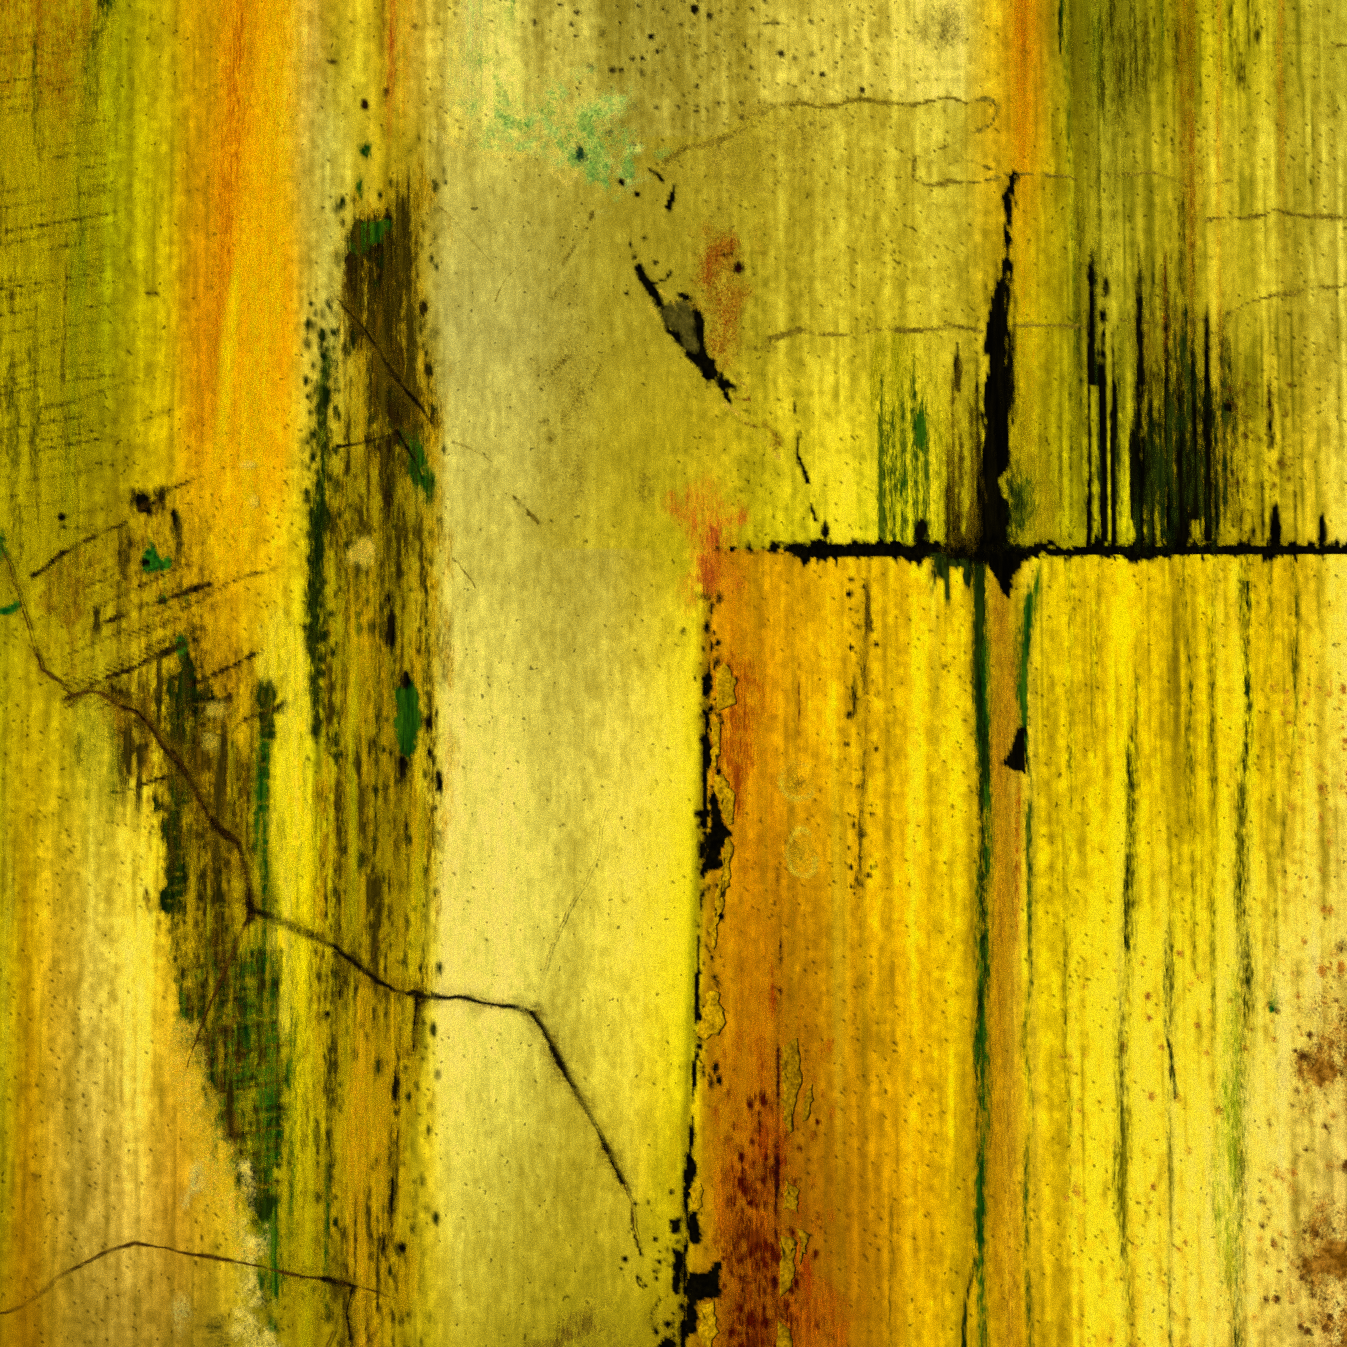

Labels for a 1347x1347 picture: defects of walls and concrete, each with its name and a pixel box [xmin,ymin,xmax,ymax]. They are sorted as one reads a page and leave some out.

leakage [661,96,997,183]
spalling [629,237,750,415]
leakage [737,326,848,355]
leakage [846,579,879,651]
crack [716,518,1347,603]
leakage [152,179,435,1347]
corrosion [711,661,756,814]
leakage [847,665,866,719]
leakage [867,142,1347,1347]
leakage [847,813,874,895]
crack [0,549,737,1347]
corrosion [714,1091,849,1347]